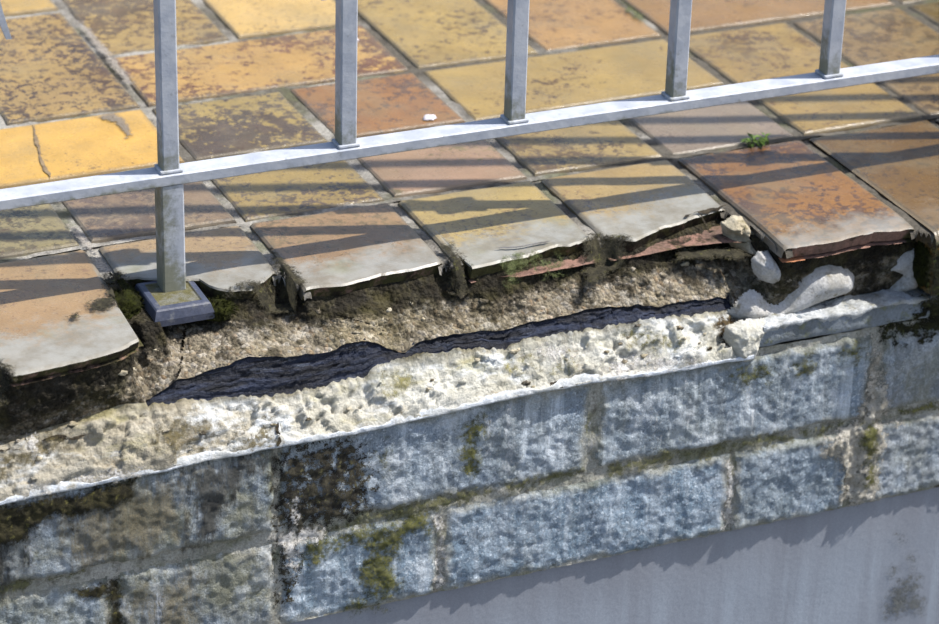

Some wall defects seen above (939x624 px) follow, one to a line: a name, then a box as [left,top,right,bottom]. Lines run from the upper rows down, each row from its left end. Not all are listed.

crack [33,124,51,178]
spalling [0,215,917,502]
damp [0,351,754,575]
damp [432,515,449,589]
damp [72,569,197,624]